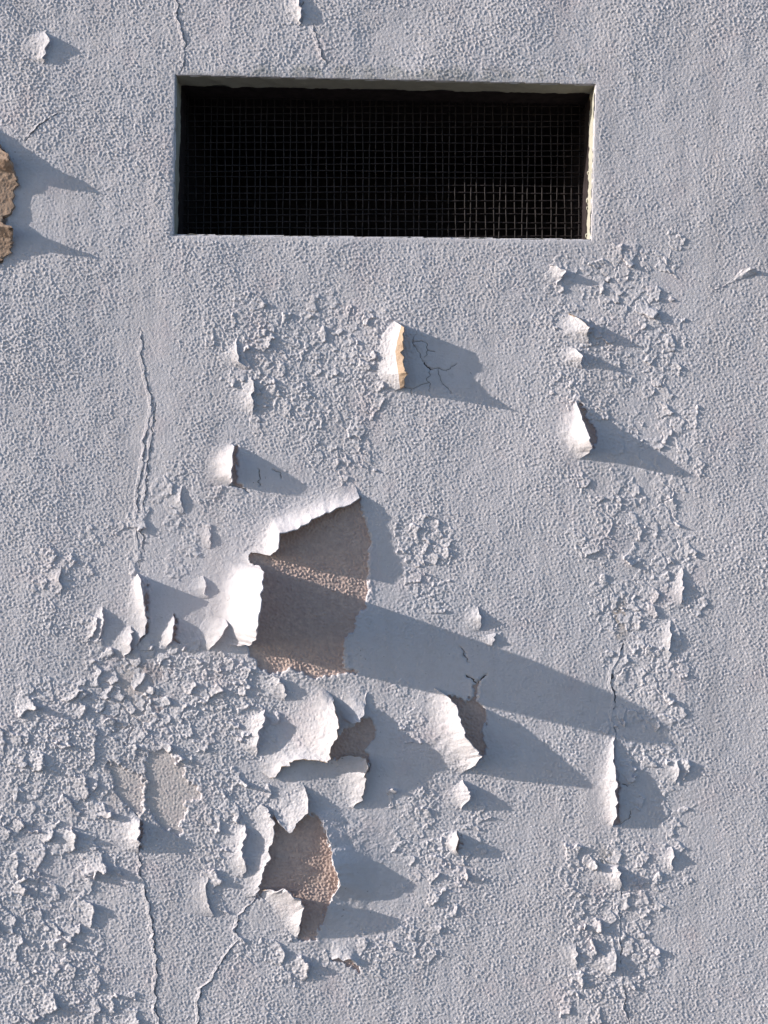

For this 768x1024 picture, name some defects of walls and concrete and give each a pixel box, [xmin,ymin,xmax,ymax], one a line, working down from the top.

peeling [0,144,20,263]
crack [133,328,157,567]
crack [408,337,455,394]
peeling [0,284,496,1024]
crack [607,640,624,733]
peeling [531,225,709,1024]
crack [136,853,160,1024]